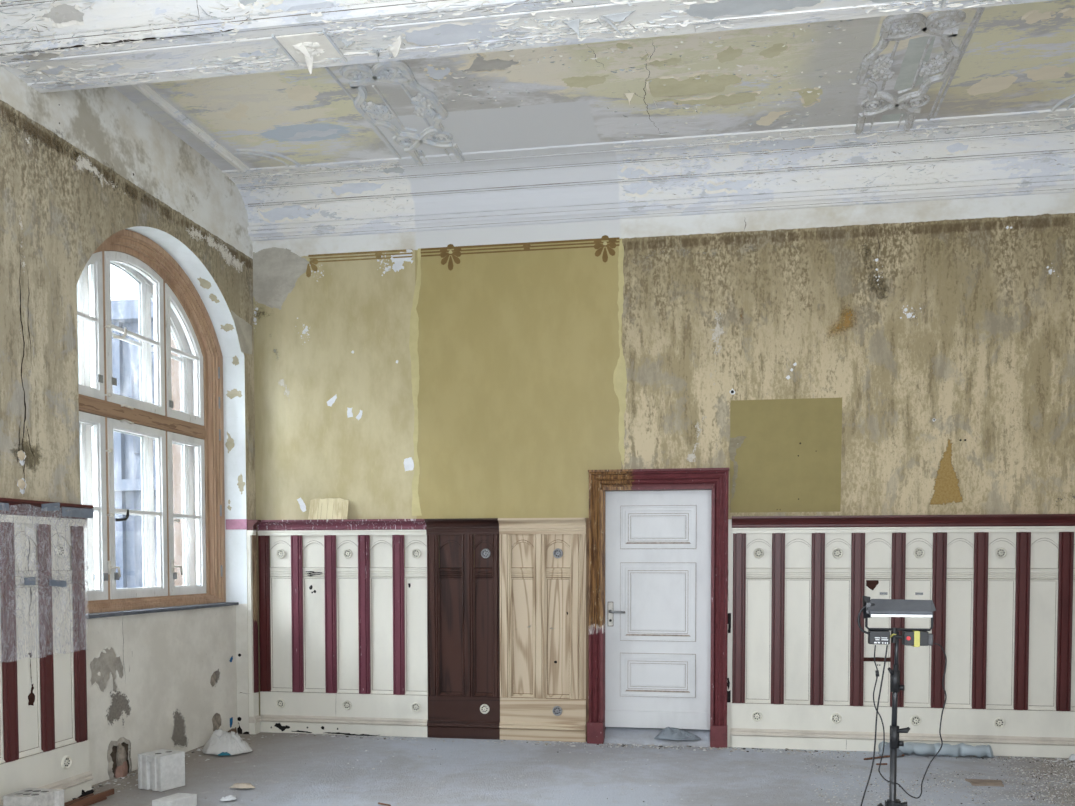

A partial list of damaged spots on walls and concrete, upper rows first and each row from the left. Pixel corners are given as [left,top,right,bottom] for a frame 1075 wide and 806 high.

peeling [197,277,220,303]
damp [862,245,887,306]
peeling [221,303,258,366]
peeling [226,389,243,399]
damp [12,442,42,471]
damp [930,439,963,505]
spalling [88,646,124,694]
spalling [107,737,132,779]